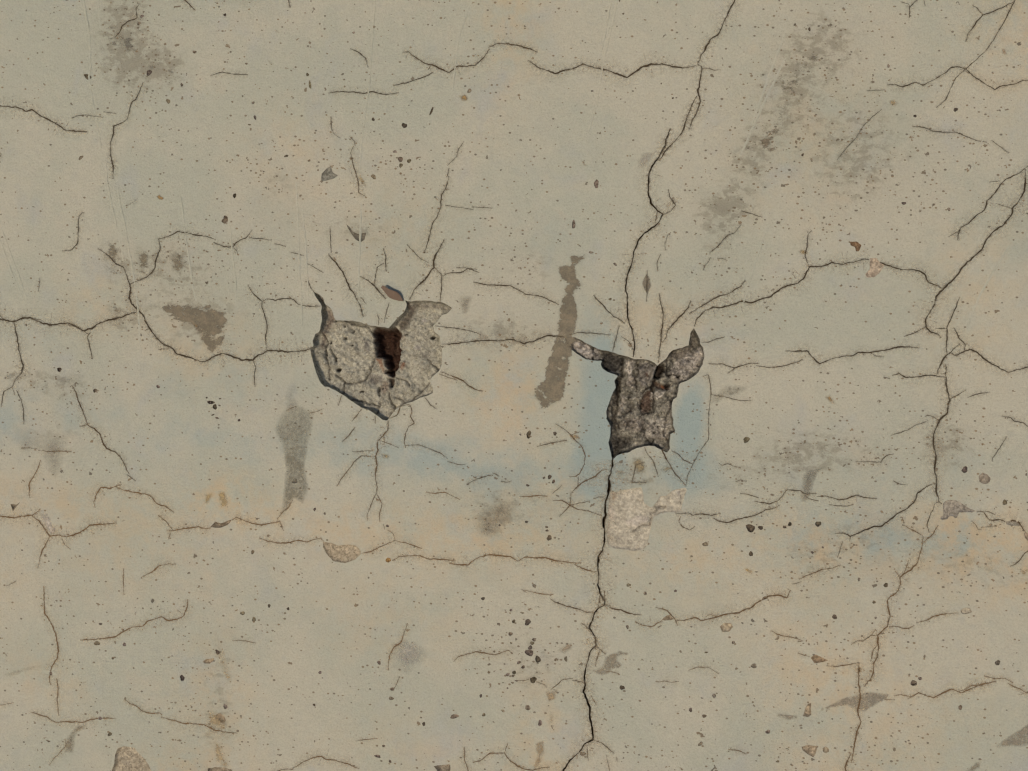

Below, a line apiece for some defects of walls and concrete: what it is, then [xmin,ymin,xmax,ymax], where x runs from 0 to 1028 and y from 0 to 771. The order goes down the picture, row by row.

spalling [310,285,452,420]